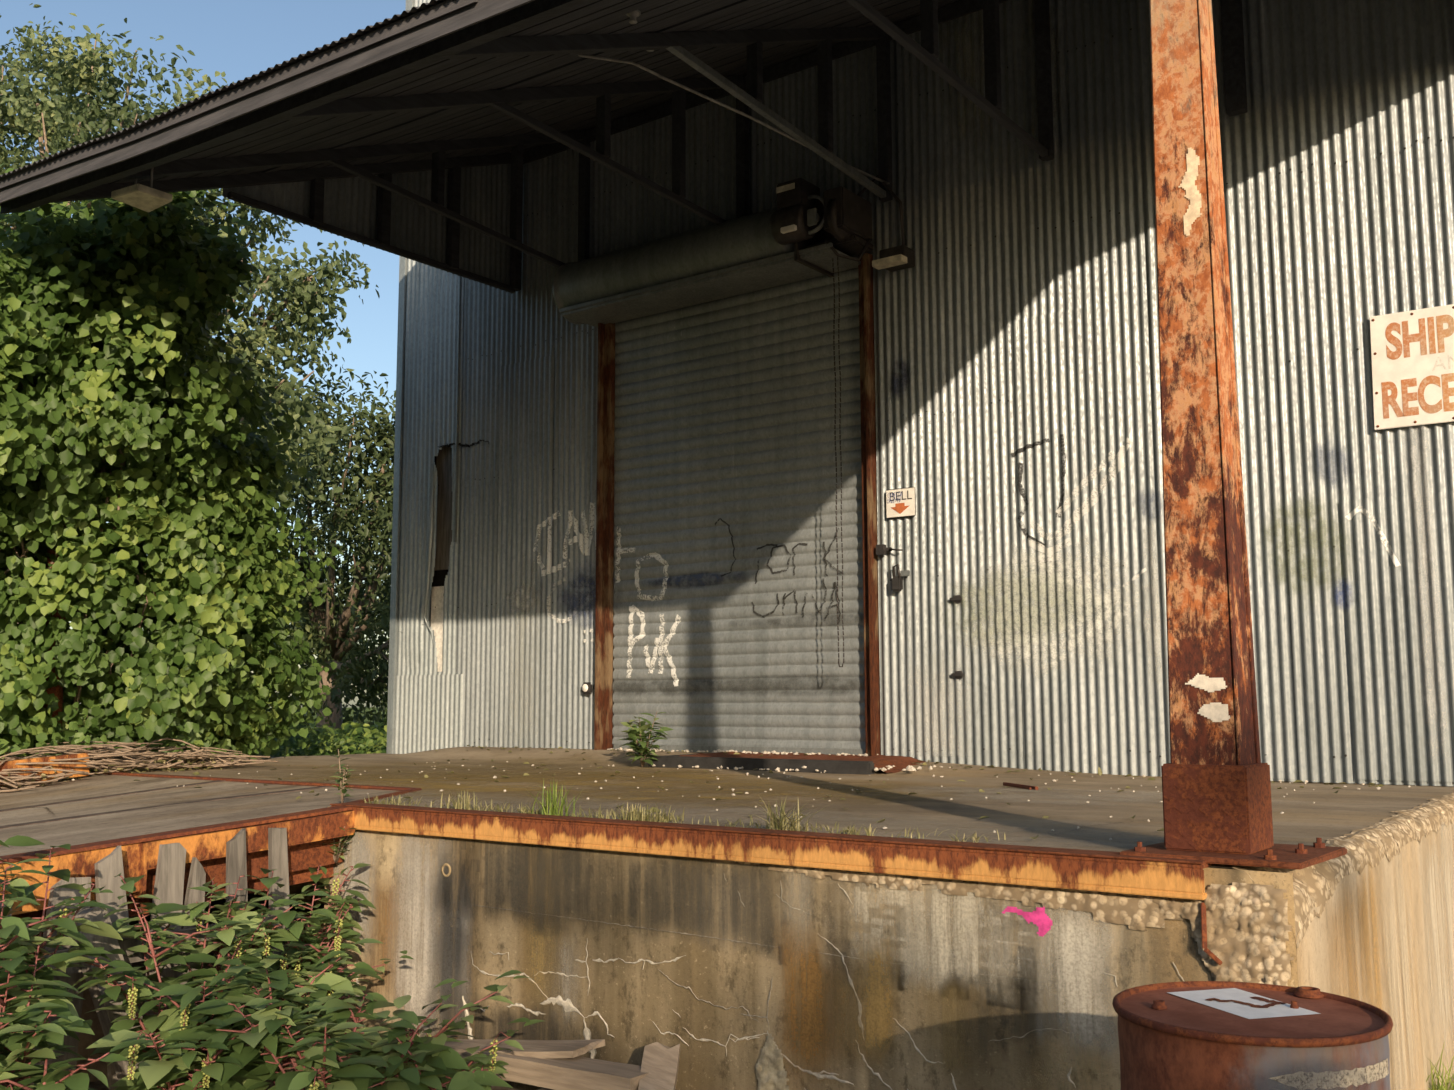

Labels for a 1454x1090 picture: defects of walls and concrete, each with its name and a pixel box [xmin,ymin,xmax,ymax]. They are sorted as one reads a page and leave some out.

spalling [431,570,448,589]
water stain [397,834,589,1040]
water stain [506,1081,543,1090]
crack [471,875,957,1090]
water stain [630,860,805,950]
water stain [755,1034,789,1090]
water stain [855,873,1109,1042]
spalling [734,793,1454,986]